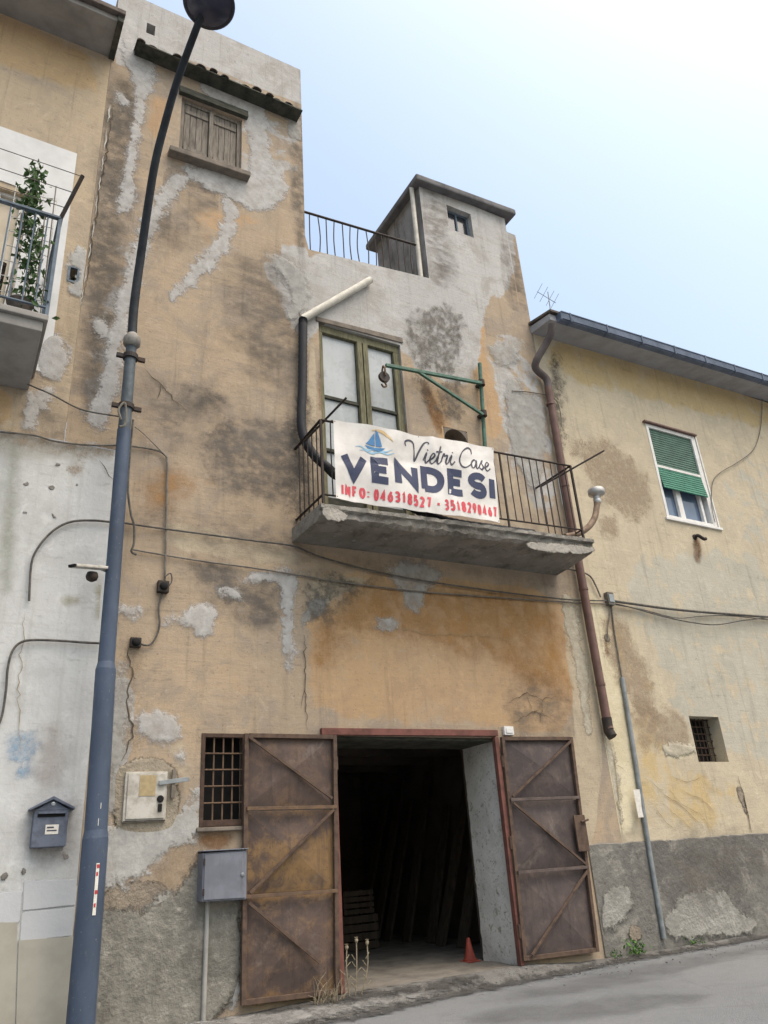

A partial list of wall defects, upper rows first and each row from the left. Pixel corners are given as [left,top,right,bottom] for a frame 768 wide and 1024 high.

crack [80,105,113,307]
peeling [168,198,240,302]
water stain [406,304,465,417]
water stain [206,422,315,523]
crack [300,635,308,730]
crack [513,692,556,723]
flaking render [104,879,166,915]
peeling [602,883,642,943]